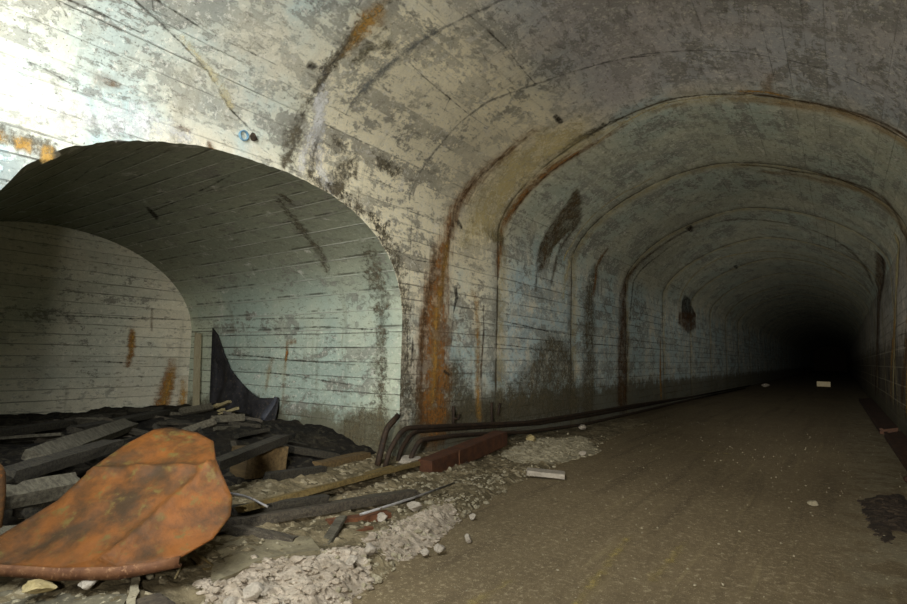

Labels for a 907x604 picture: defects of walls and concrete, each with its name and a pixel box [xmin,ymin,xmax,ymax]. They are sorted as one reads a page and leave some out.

peeling [0,76,171,140]
leakage [535,189,594,296]
corrosion [126,329,135,367]
corrosion [155,363,187,406]
corrosion [416,171,481,450]
leakage [404,251,606,434]
corrosion [617,248,660,412]